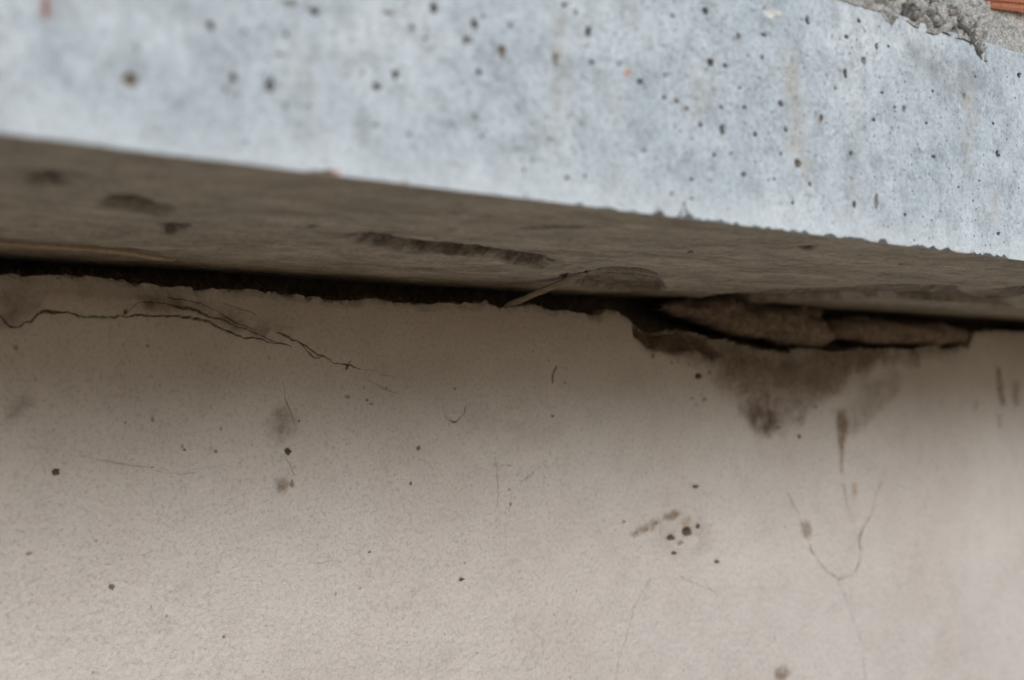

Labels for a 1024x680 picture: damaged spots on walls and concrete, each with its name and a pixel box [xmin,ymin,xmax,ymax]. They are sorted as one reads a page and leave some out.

crack [2,298,361,370]
leakage [838,412,848,453]